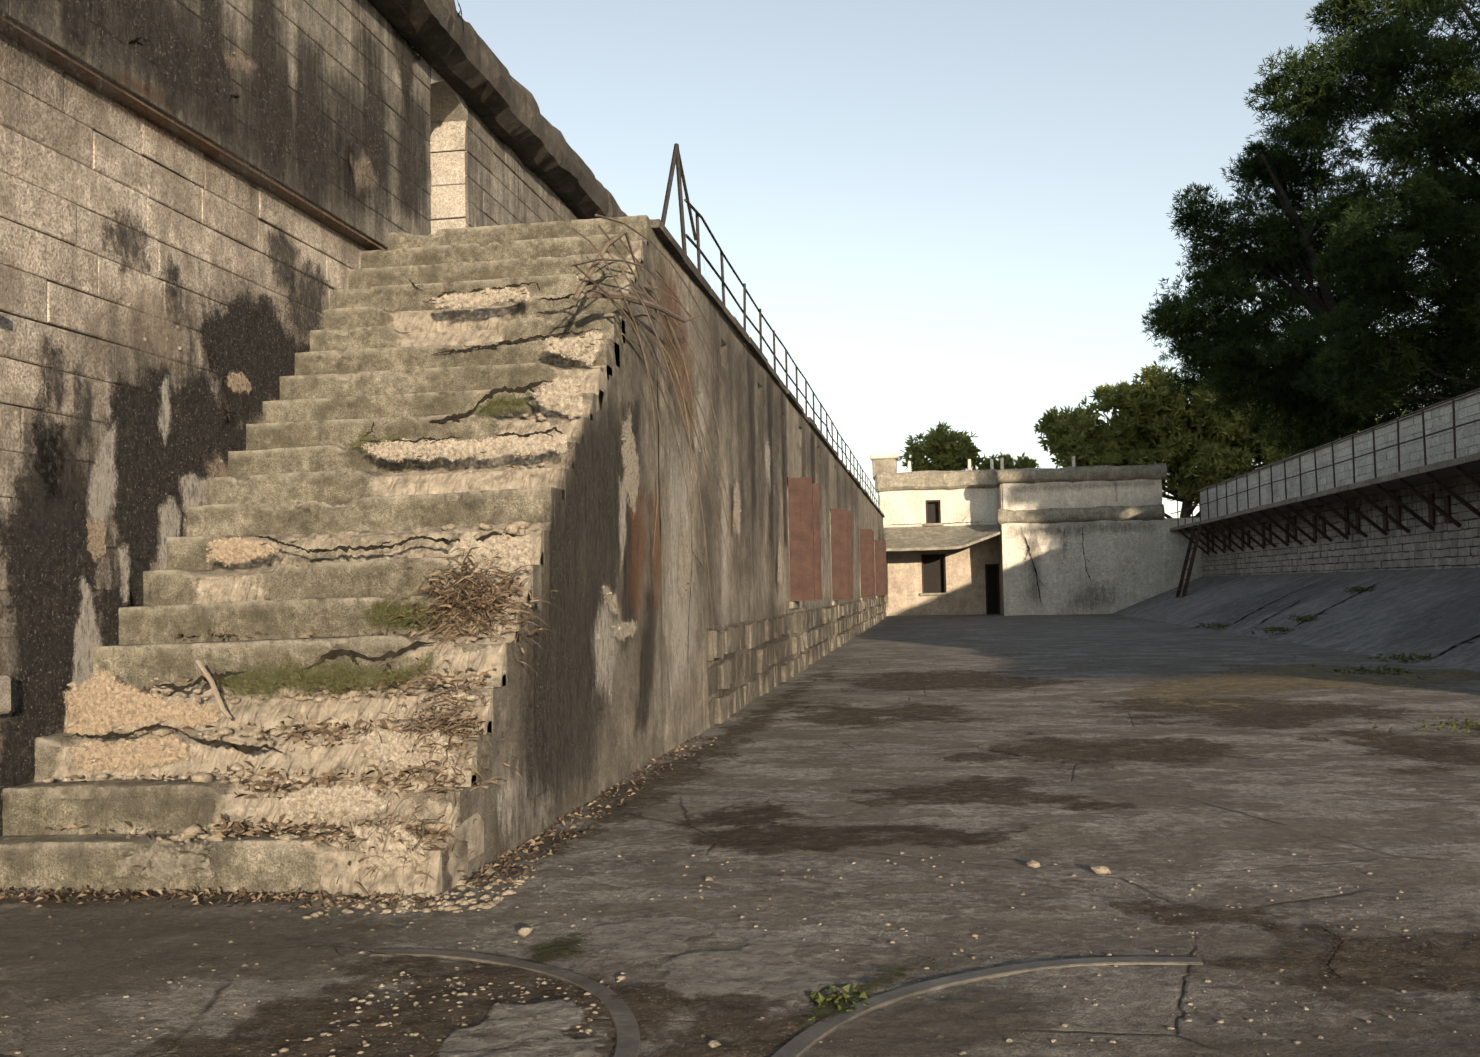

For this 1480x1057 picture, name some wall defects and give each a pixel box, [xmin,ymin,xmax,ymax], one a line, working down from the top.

leakage [129,0,233,133]
leakage [249,0,328,200]
leakage [362,22,413,181]
crack [361,380,563,443]
leakage [0,207,331,836]
crack [255,531,532,553]
crack [153,671,249,691]
crack [303,641,437,669]
crack [64,723,283,754]